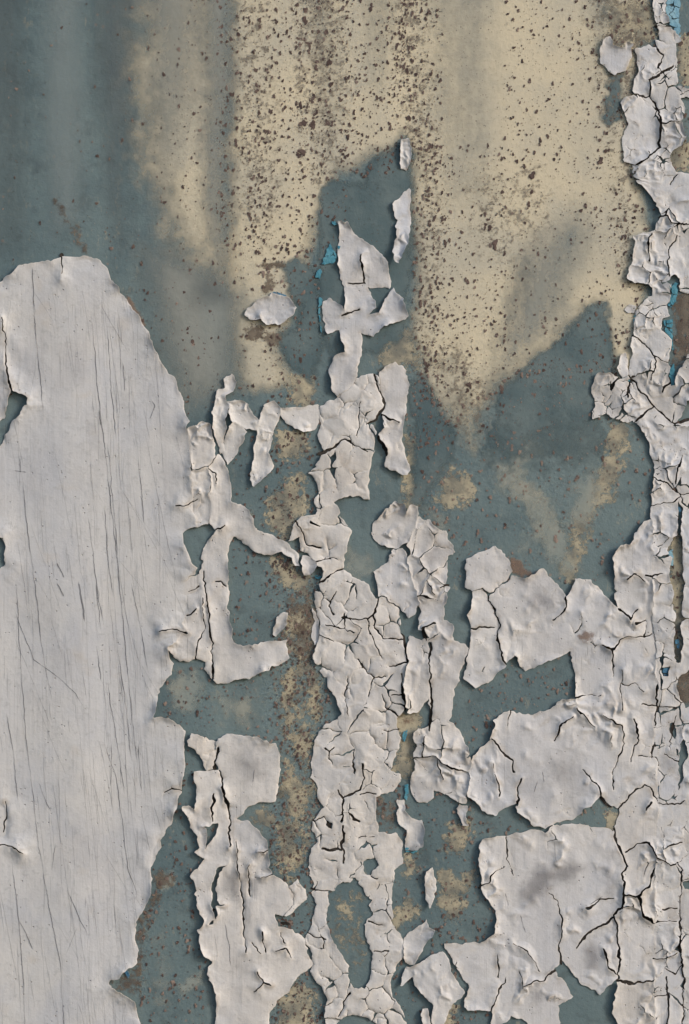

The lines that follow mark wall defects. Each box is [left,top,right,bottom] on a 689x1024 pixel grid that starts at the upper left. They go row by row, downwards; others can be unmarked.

rust [105,0,656,581]
peeling [129,0,649,414]
crack [632,25,680,165]
rust [112,750,215,1024]
peeling [168,454,312,684]
rust [163,539,332,934]
peeling [182,734,318,1024]
rust [271,970,325,1024]
crack [312,747,376,863]
peeling [263,328,465,1024]
crack [295,520,467,780]
crack [491,608,686,1024]